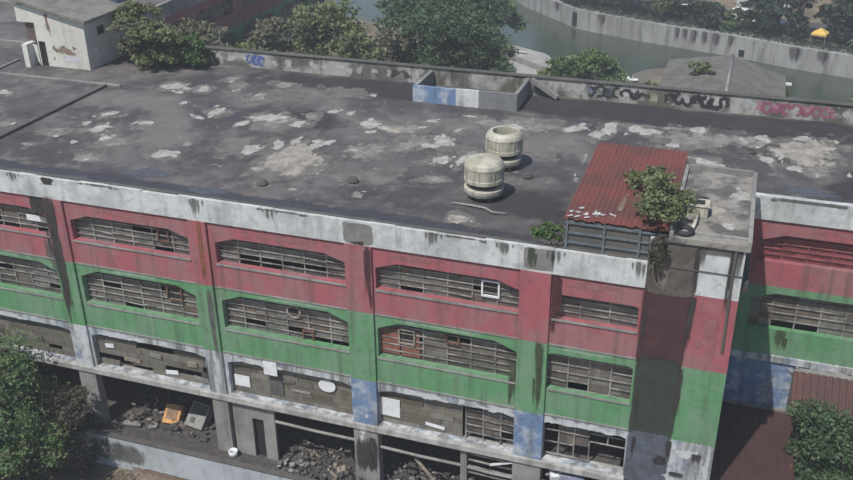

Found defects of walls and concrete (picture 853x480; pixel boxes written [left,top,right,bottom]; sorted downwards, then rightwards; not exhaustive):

spalling [52,46,76,60]
peeling [144,75,853,198]
leakage [29,196,73,322]
leakage [0,160,537,266]
spalling [342,222,373,245]
leakage [351,241,372,307]
leakage [482,190,566,223]
leakage [551,275,562,331]
leakage [532,343,543,403]
leakage [623,237,743,480]
leakage [90,438,189,480]
leakage [357,437,378,471]